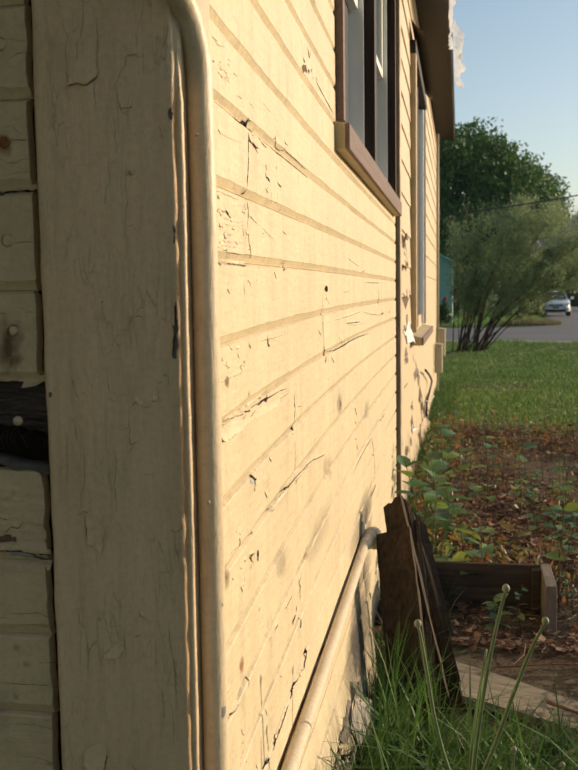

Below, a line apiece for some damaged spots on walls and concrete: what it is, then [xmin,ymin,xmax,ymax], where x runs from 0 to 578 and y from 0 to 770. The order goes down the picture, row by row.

peeling [302,47,334,114]
peeling [213,99,306,169]
peeling [216,186,250,267]
spalling [0,374,52,475]
peeling [222,387,287,442]
water stain [348,600,369,687]
crack [227,672,258,770]